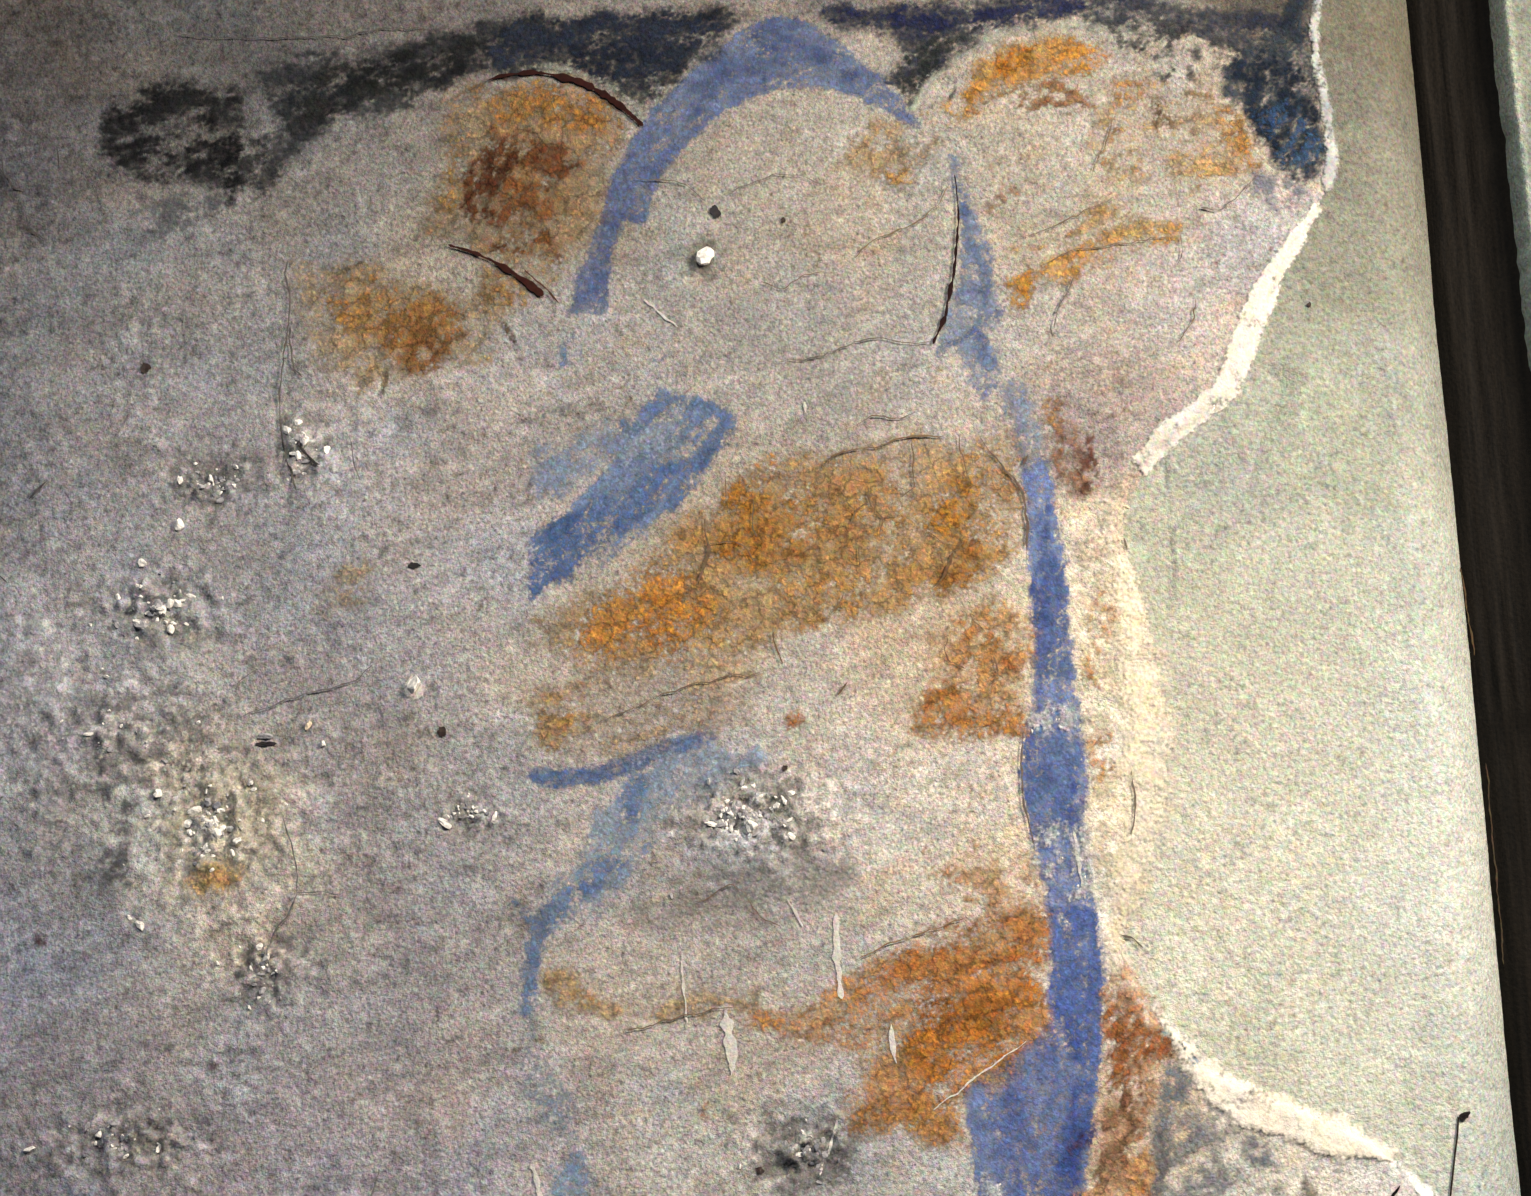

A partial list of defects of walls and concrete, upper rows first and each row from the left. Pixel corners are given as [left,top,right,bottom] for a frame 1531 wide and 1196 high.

crack [763,175,960,362]
flaking render [1152,1004,1433,1196]